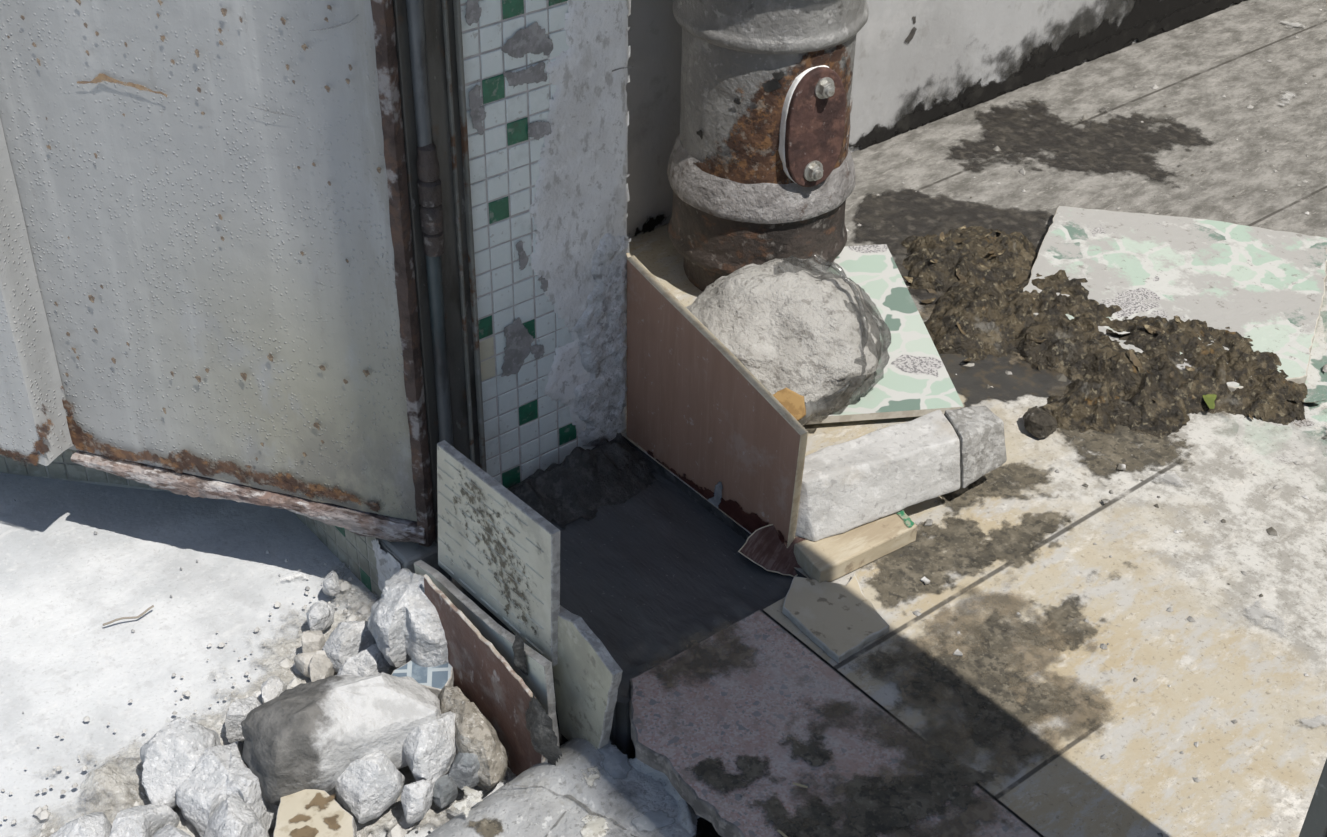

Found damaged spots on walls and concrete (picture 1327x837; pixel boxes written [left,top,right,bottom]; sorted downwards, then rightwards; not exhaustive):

corrosion [77,73,167,97]
corrosion [693,44,853,184]
water stain [848,0,1245,188]
water stain [635,214,667,236]
flaking render [569,233,631,447]
corrosion [0,373,380,512]